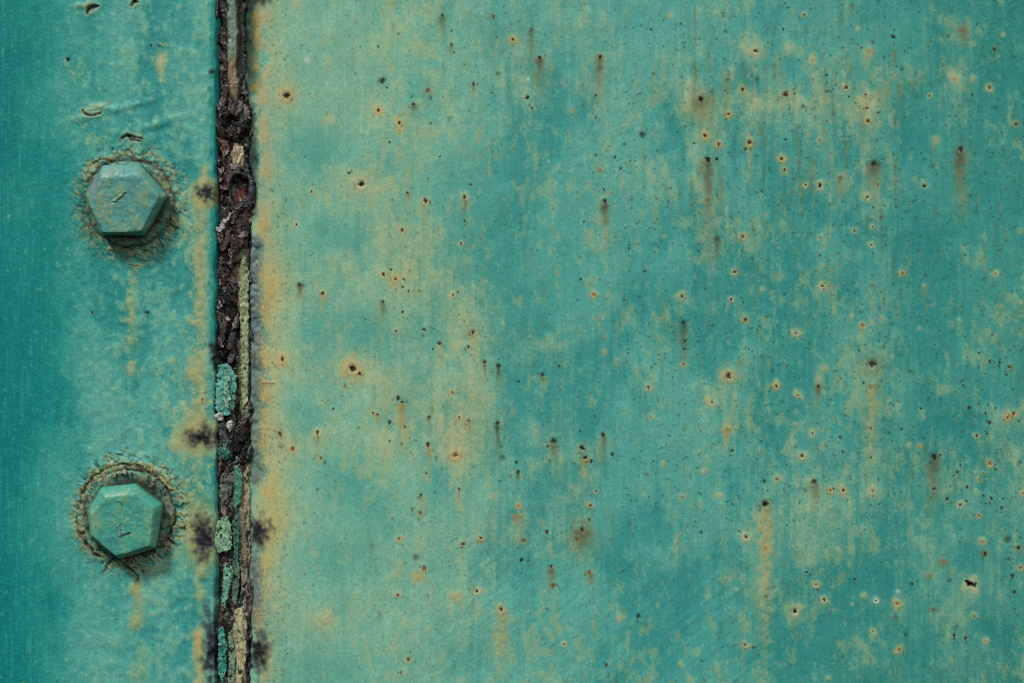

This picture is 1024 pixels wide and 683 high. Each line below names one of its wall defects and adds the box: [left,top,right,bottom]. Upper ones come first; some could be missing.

peeling [81,0,103,19]
peeling [63,135,194,270]
corrosion [596,197,614,249]
corrosion [685,37,768,278]
corrosion [928,133,987,217]
corrosion [330,347,373,389]
corrosion [704,357,747,447]
corrosion [914,441,947,516]
corrosion [736,469,833,667]
corrosion [922,534,1024,629]